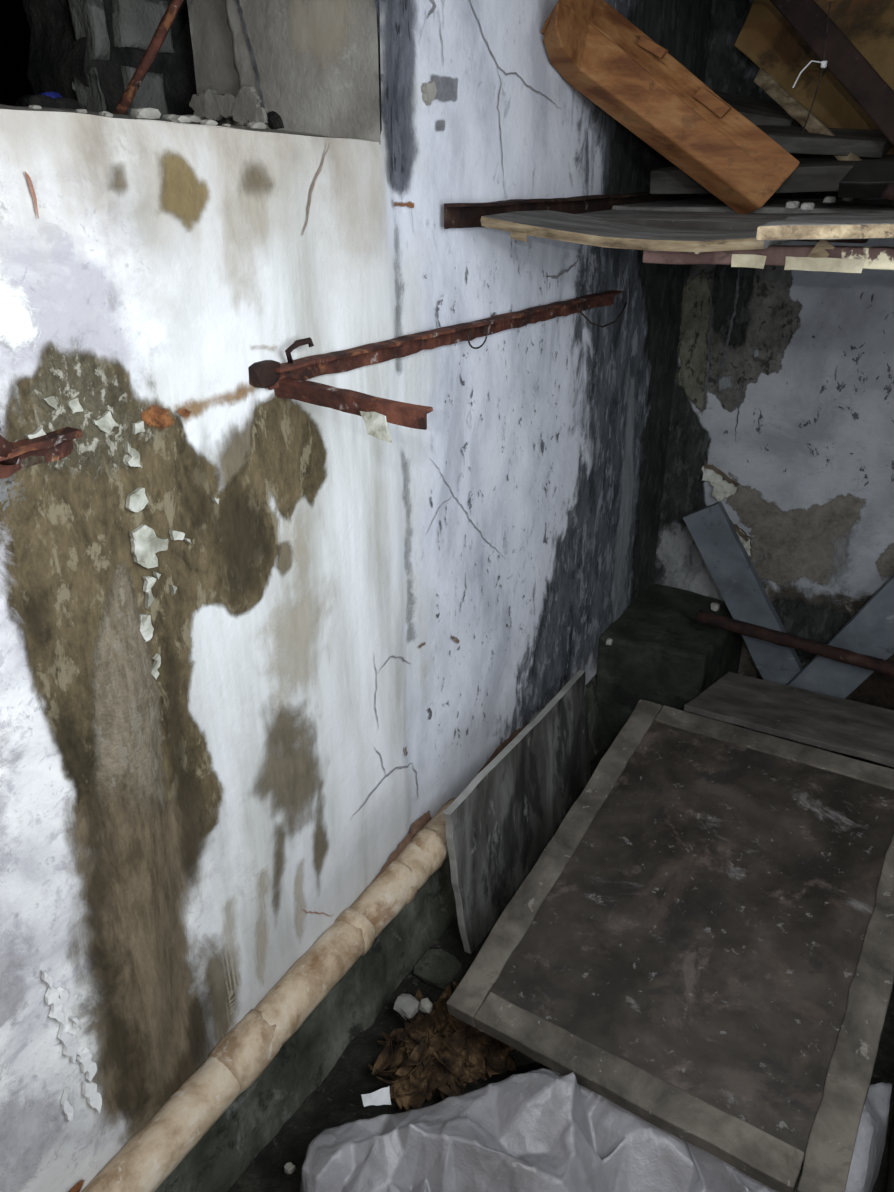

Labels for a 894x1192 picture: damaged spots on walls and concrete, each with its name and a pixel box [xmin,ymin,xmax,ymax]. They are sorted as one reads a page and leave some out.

crack [427,0,444,61]
crack [470,1,560,186]
water stain [604,0,775,101]
water stain [162,152,209,229]
water stain [572,101,675,195]
spalling [676,264,802,452]
peeling [24,427,46,439]
rust [0,427,83,479]
peeling [42,396,145,469]
water stain [500,246,724,744]
peeling [125,487,192,642]
water stain [0,343,328,1140]